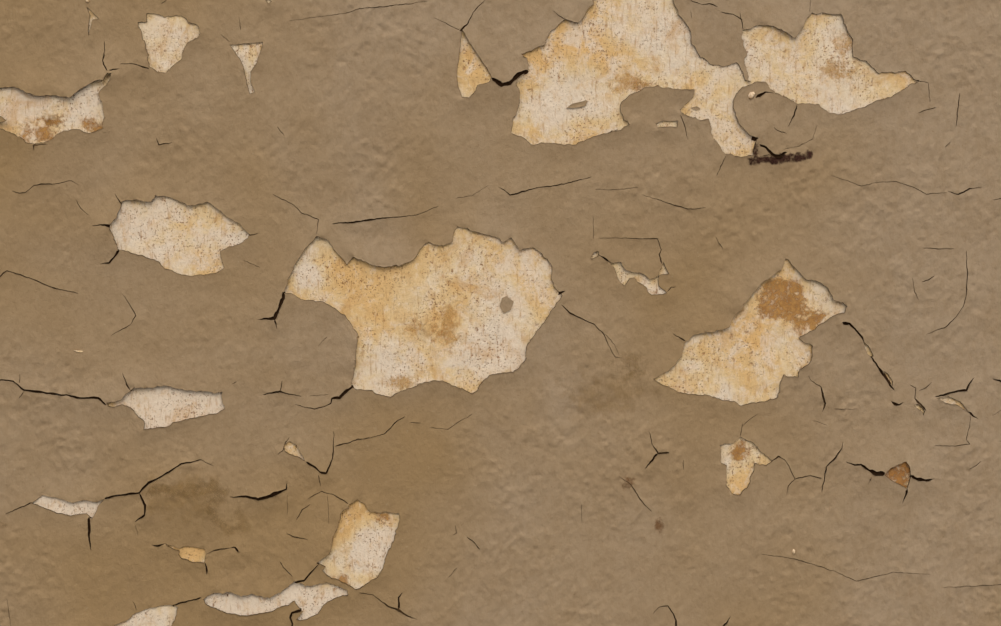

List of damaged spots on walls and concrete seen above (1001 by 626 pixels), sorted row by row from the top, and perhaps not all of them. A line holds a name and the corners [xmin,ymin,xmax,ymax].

peeling [0,68,116,144]
peeling [511,0,918,162]
peeling [105,190,249,276]
crack [0,379,106,405]
crack [261,292,285,324]
peeling [279,227,564,399]
peeling [654,258,849,406]
crack [842,322,1001,417]
crack [105,459,201,521]
crack [236,485,287,500]
crack [773,448,884,491]
peeling [204,496,400,625]